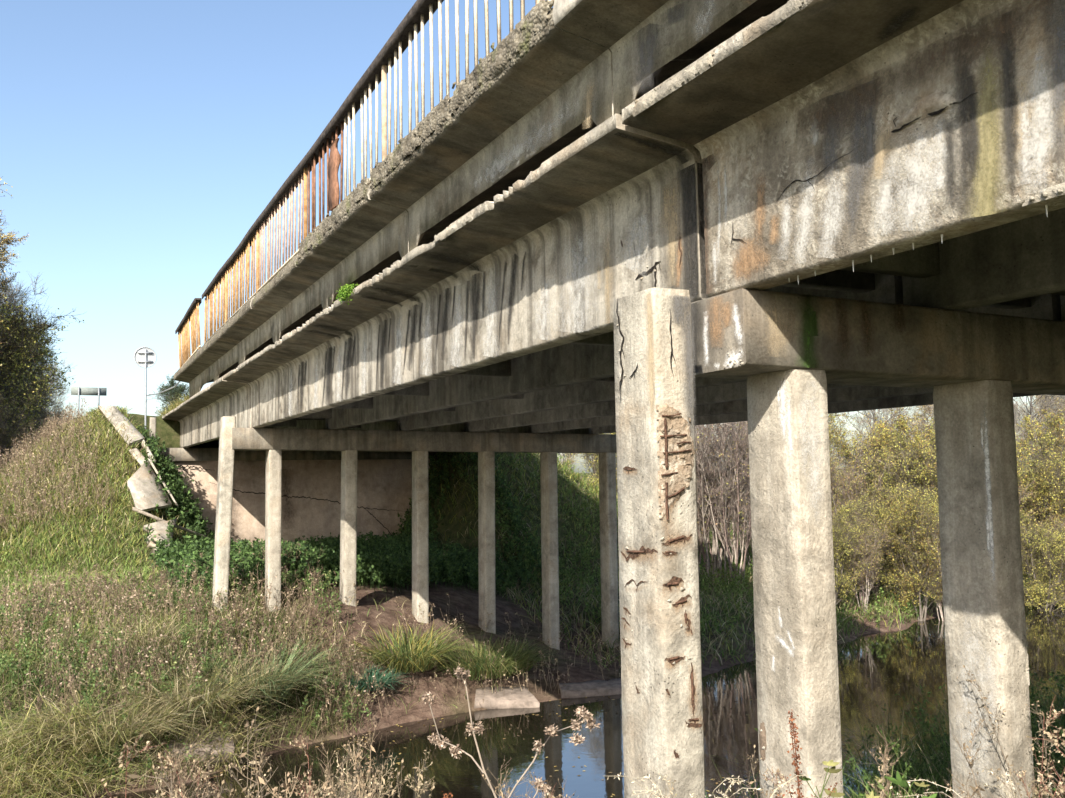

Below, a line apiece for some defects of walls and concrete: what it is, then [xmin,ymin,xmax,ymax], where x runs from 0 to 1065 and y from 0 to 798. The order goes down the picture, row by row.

crack [891,92,978,133]
water stain [879,0,1065,228]
crack [775,151,852,204]
water stain [803,82,875,252]
water stain [783,182,813,254]
crack [634,244,661,287]
water stain [289,252,526,414]
crack [616,298,638,402]
crack [668,311,676,377]
spalling [656,403,695,519]
crack [164,465,395,535]